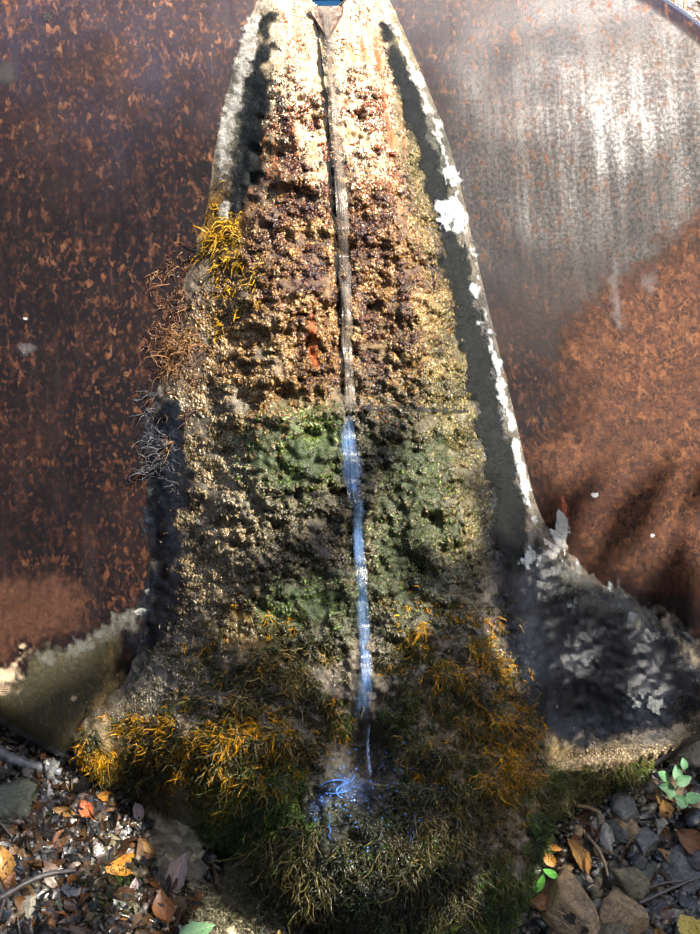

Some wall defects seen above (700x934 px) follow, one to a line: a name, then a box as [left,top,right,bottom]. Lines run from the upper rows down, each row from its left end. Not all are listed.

rust [361,36,382,73]
water stain [275,262,339,300]
water stain [276,304,338,342]
rust [534,218,700,595]
water stain [400,413,450,440]
water stain [139,751,268,831]